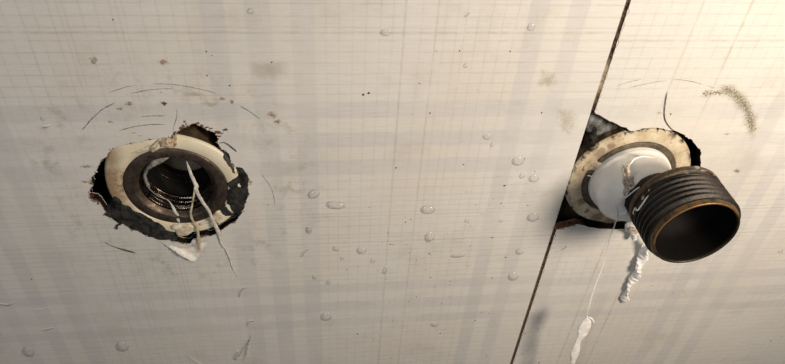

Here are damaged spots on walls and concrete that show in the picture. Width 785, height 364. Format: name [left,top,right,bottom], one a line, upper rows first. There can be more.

spalling [88,123,250,236]
spalling [170,206,245,245]